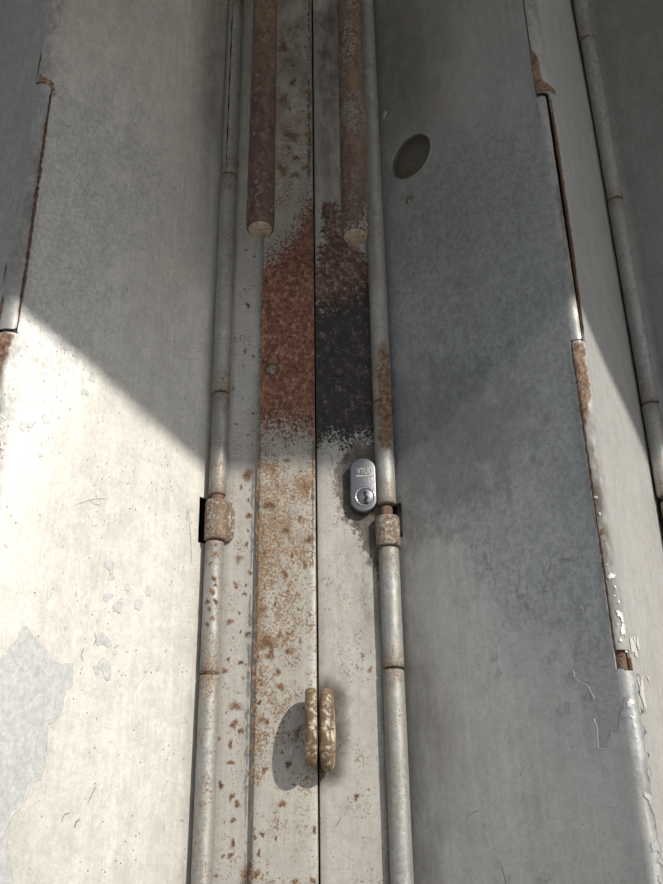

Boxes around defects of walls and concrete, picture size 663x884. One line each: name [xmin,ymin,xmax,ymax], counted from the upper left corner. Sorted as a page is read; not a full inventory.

corrosion [18,39,55,323]
corrosion [529,40,585,332]
corrosion [0,332,14,375]
corrosion [200,71,369,821]
water stain [316,278,374,455]
corrosion [377,343,393,449]
corrosion [571,342,617,660]
peeling [606,564,640,658]
peeling [572,661,650,750]
corrosion [241,832,265,884]